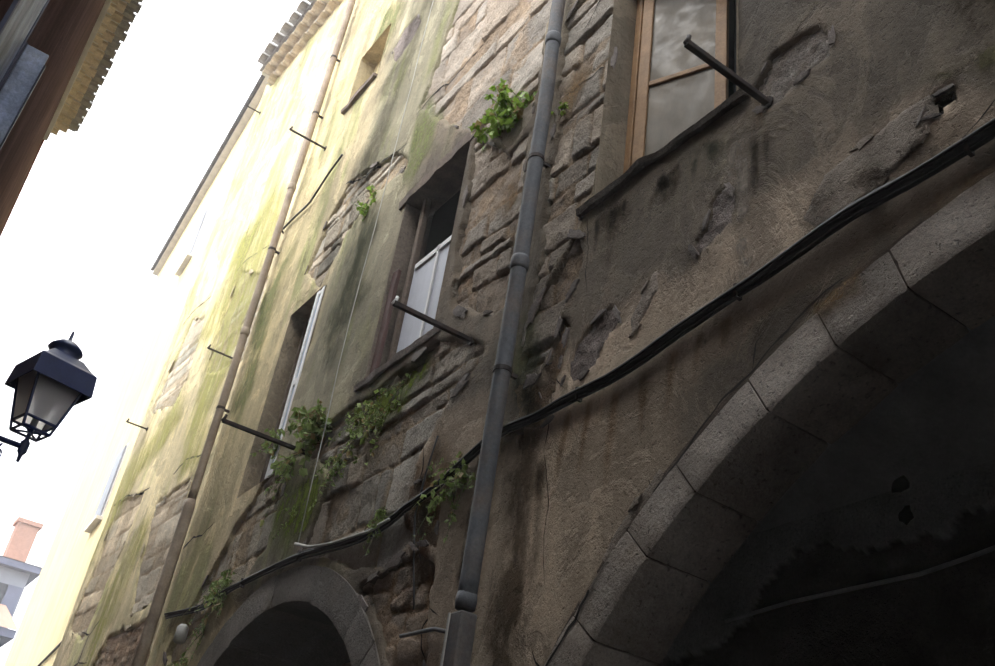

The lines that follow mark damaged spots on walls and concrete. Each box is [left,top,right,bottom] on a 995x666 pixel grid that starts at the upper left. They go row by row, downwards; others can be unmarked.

flaking render [751,25,836,115]
flaking render [304,155,408,288]
flaking render [521,0,658,400]
peeling [688,182,735,258]
peeling [803,84,955,227]
flaking render [152,317,205,414]
flaking render [209,269,268,373]
flaking render [71,493,144,640]
flaking render [129,476,192,617]
flaking render [163,341,484,666]
damp [490,337,544,666]